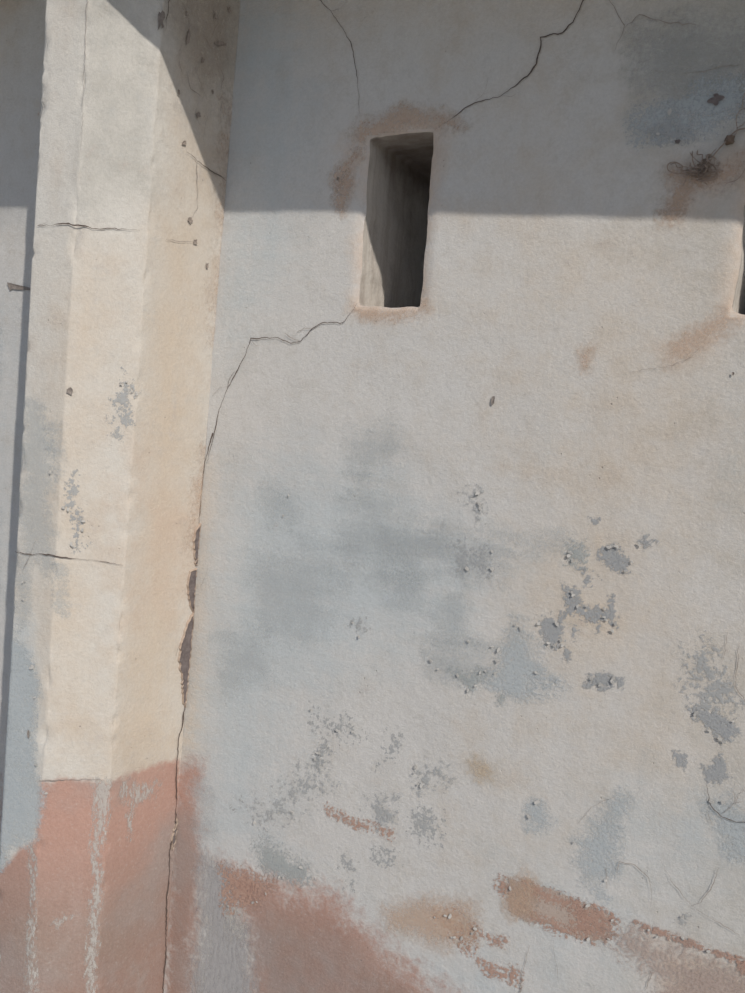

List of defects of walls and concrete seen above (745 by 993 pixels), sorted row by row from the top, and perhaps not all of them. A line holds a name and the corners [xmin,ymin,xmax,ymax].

crack [321,1,360,113]
crack [432,0,584,133]
crack [38,222,136,230]
crack [166,153,225,242]
crack [15,542,120,572]
crack [163,305,356,993]
peeling [537,540,634,662]
peeling [582,670,625,692]
peeling [671,630,745,787]
peeling [0,641,48,991]
crack [706,785,745,826]